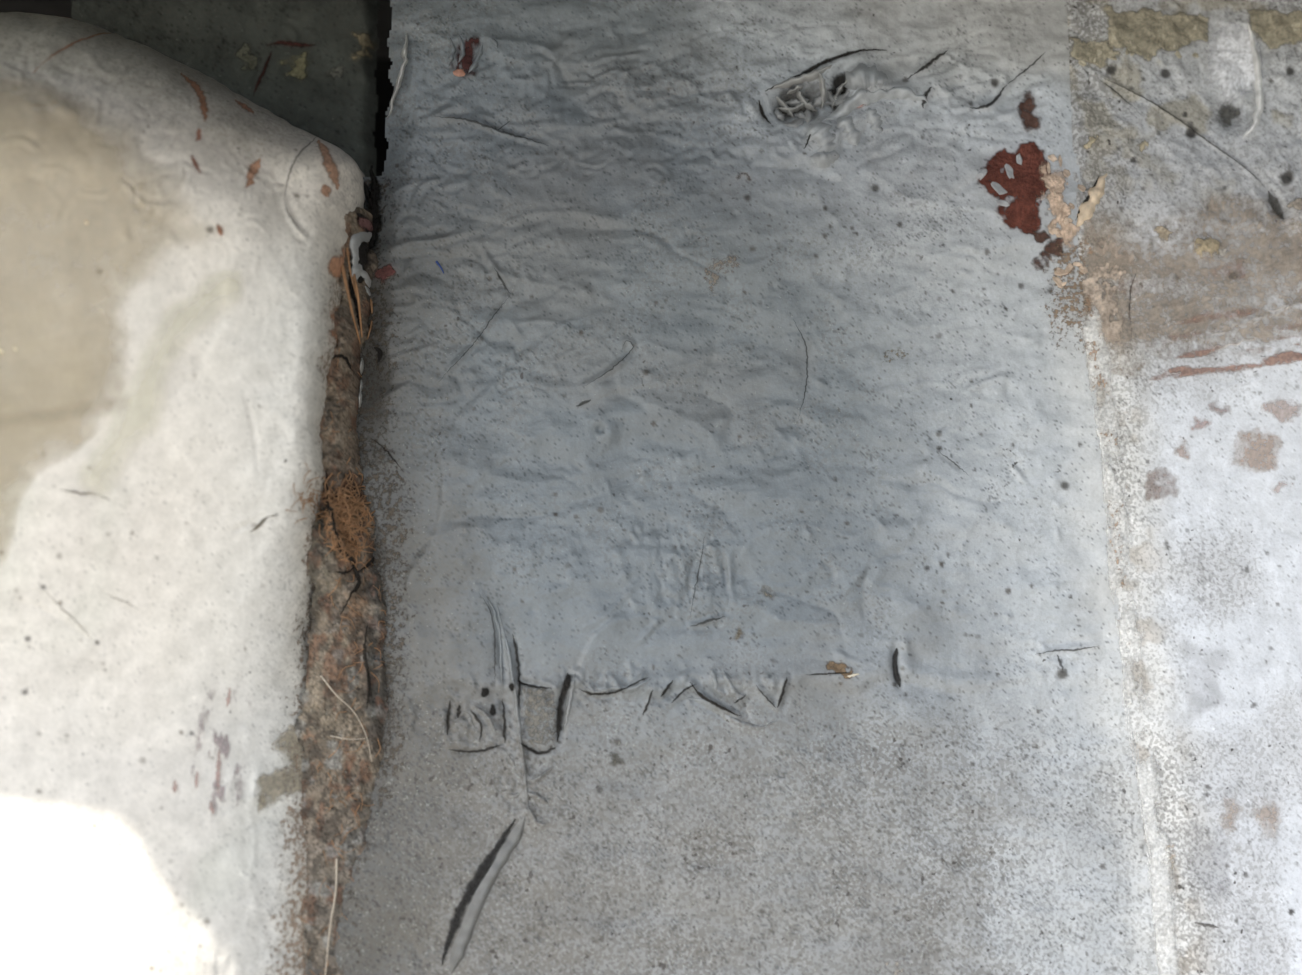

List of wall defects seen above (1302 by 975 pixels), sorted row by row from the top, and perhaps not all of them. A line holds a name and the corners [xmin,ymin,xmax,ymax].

corrosion [1018,92,1040,131]
water stain [0,97,154,510]
crack [332,165,383,371]
crack [325,474,374,709]
spalling [893,648,901,687]